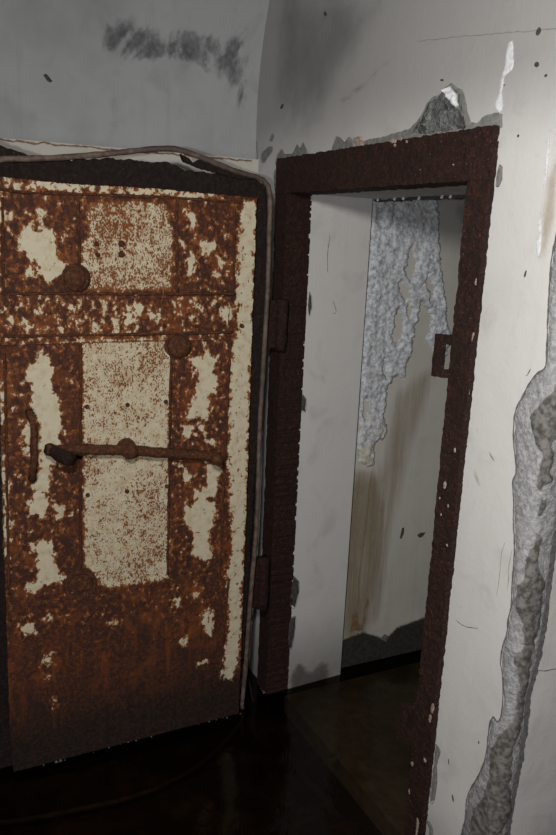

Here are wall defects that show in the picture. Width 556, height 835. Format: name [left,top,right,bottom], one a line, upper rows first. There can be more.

water stain [109,24,172,56]
spalling [331,79,503,150]
spalling [460,234,556,835]